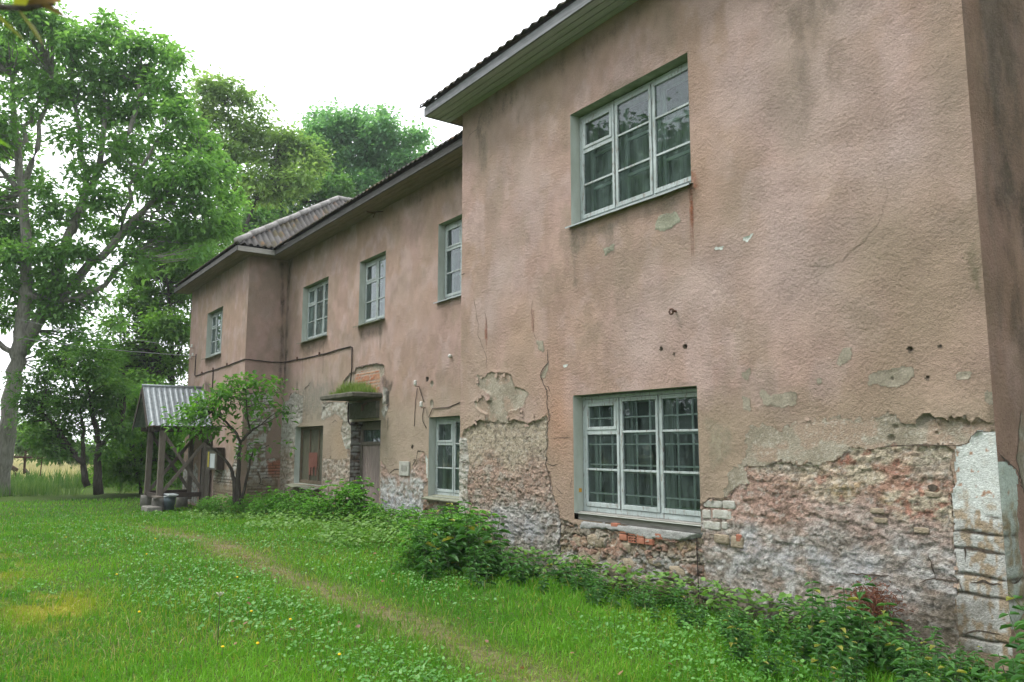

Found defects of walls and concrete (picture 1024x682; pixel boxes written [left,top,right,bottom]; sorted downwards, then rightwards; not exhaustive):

flaking render [321,401,354,504]
flaking render [344,364,388,417]
flaking render [380,452,428,522]
flaking render [459,372,561,576]
crack [531,301,572,494]
flaking render [700,412,1024,661]